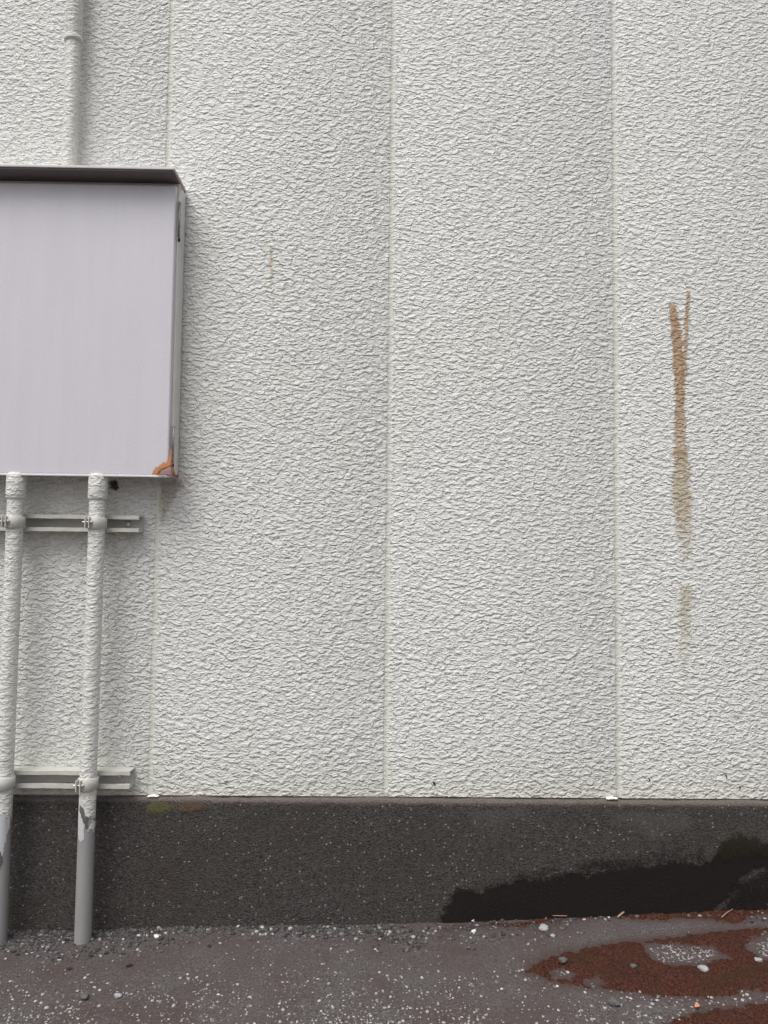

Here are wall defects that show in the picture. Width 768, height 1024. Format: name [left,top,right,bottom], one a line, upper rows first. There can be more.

rust [670,292,690,513]
leakage [440,833,768,923]